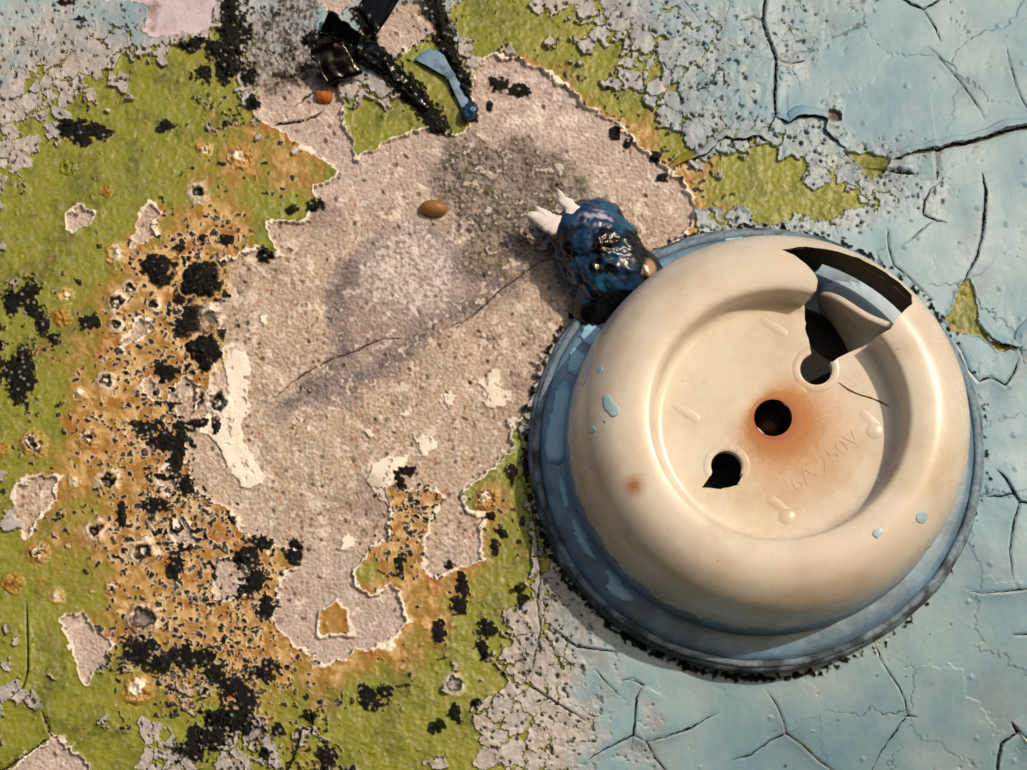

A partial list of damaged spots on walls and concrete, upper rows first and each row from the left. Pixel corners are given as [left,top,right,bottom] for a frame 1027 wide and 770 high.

crack [668,0,851,168]
peeling [687,125,898,231]
crack [886,0,1027,299]
leakage [0,281,62,411]
leakage [79,312,101,334]
leakage [102,224,304,621]
flaking render [0,0,696,770]
peeling [819,281,902,324]
peeling [944,279,1012,352]
crack [968,470,1027,594]
crack [517,473,717,770]
leakage [105,625,355,770]